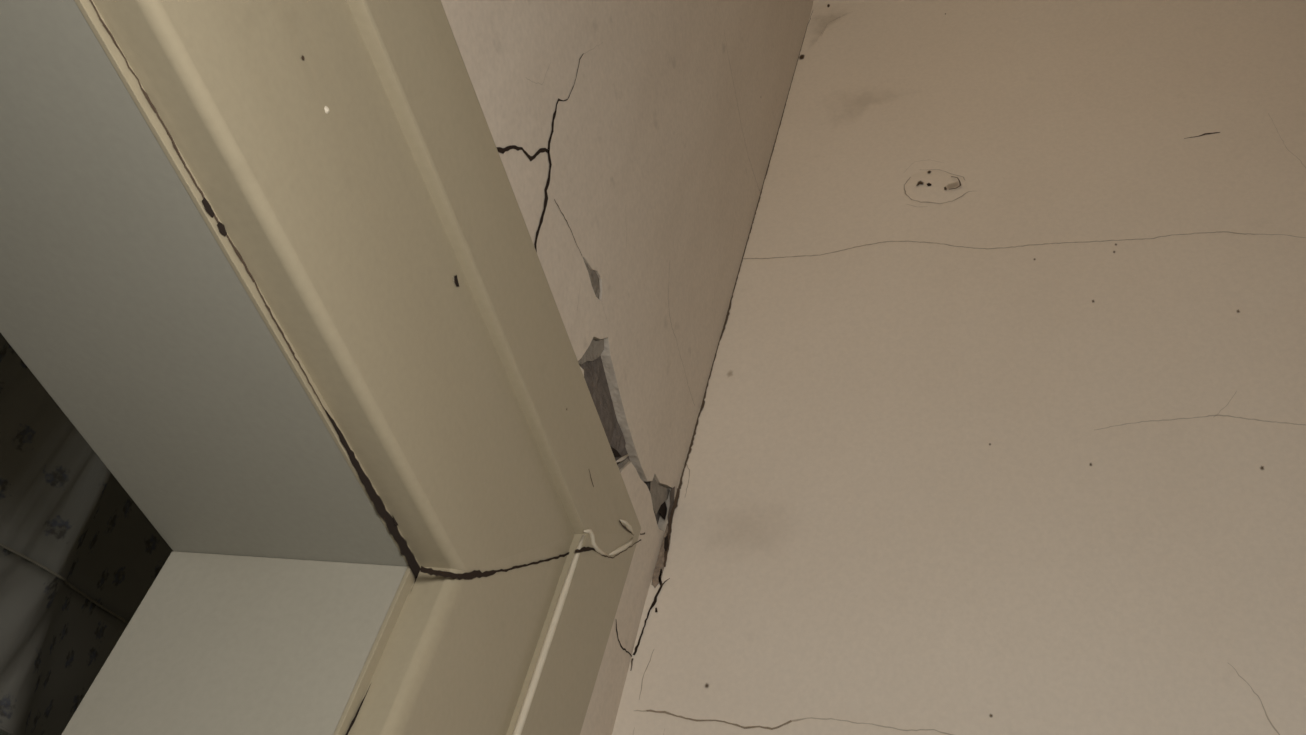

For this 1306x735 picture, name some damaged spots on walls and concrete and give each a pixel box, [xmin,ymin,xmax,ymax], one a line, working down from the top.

crack [420,11,813,671]
spalling [578,337,675,588]